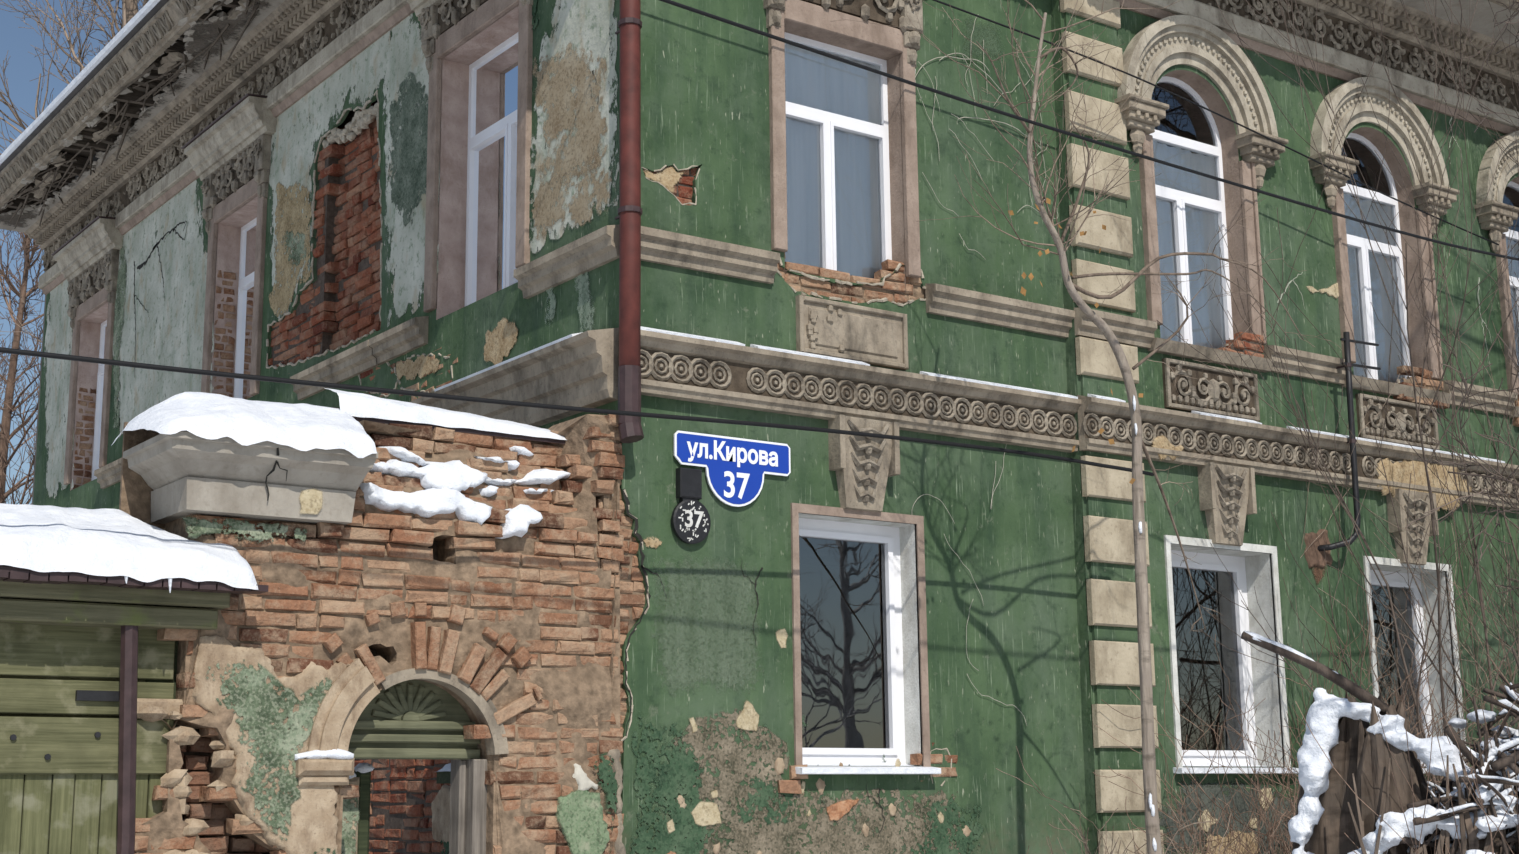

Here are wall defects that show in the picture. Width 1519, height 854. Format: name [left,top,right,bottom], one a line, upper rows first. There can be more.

spalling [140,0,266,112]
spalling [1,70,151,215]
flaking render [266,13,440,369]
flaking render [530,0,619,254]
flaking render [642,164,700,206]
flaking render [358,347,458,401]
flaking render [484,318,518,365]
spalling [137,705,255,836]
peeling [667,701,971,854]